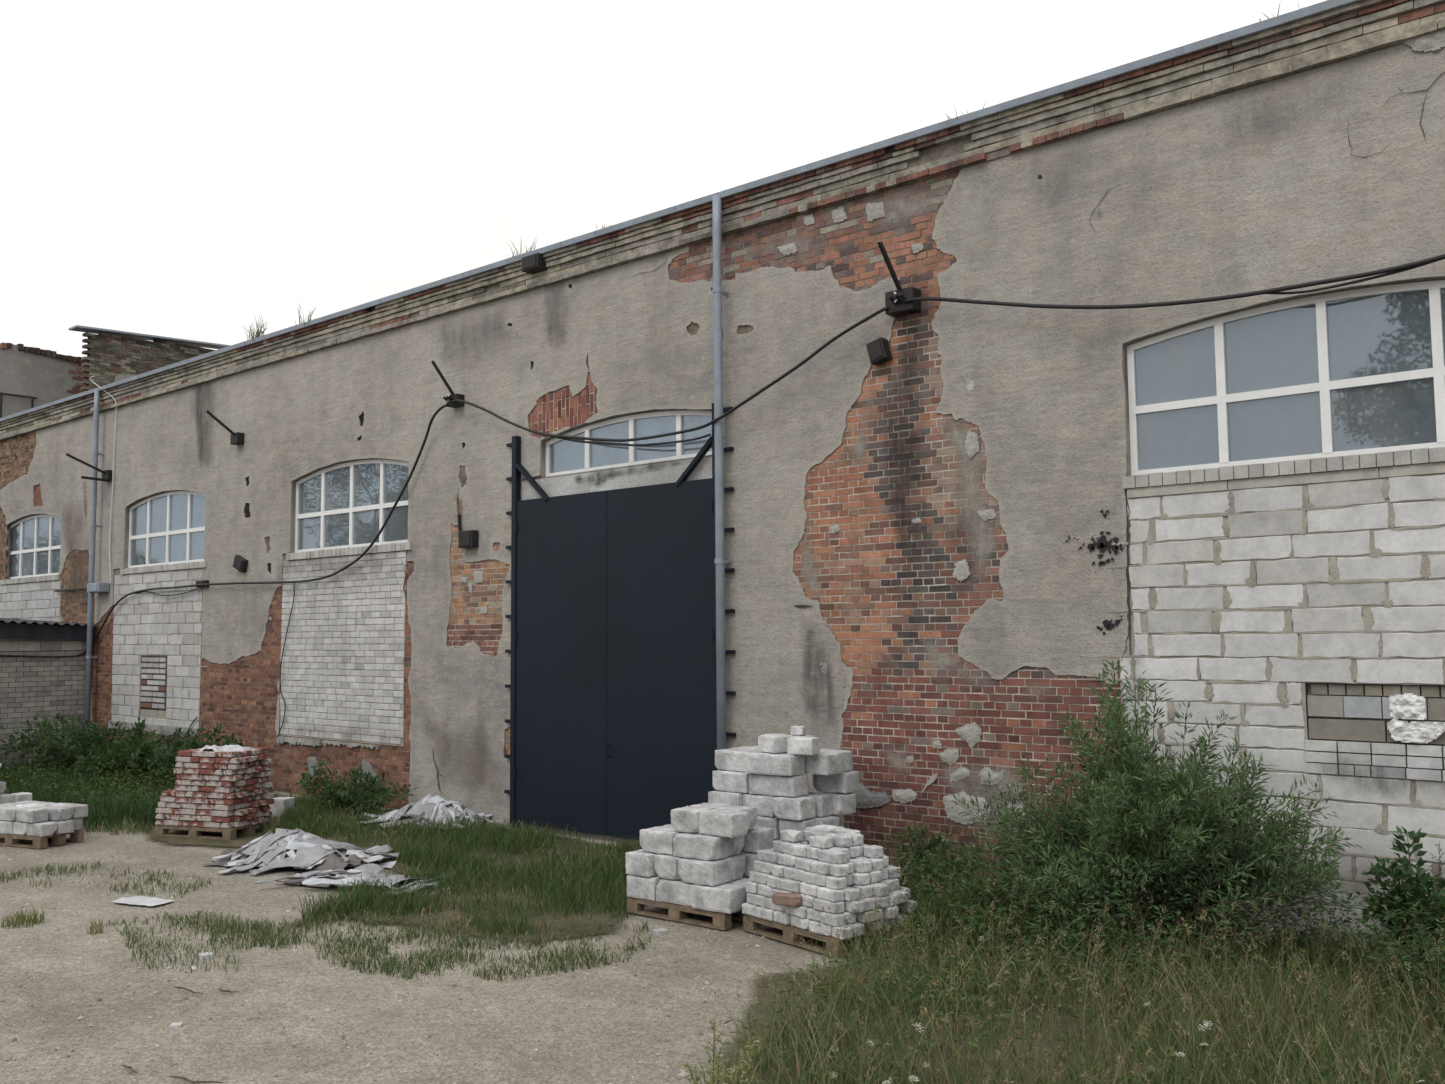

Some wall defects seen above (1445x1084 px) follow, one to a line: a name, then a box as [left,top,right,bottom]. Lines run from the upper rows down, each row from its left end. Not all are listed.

crack [1382,72,1445,142]
flaking render [528,372,598,438]
flaking render [0,431,43,580]
flaking render [447,524,510,657]
flaking render [669,170,1125,898]
flaking render [59,537,414,809]